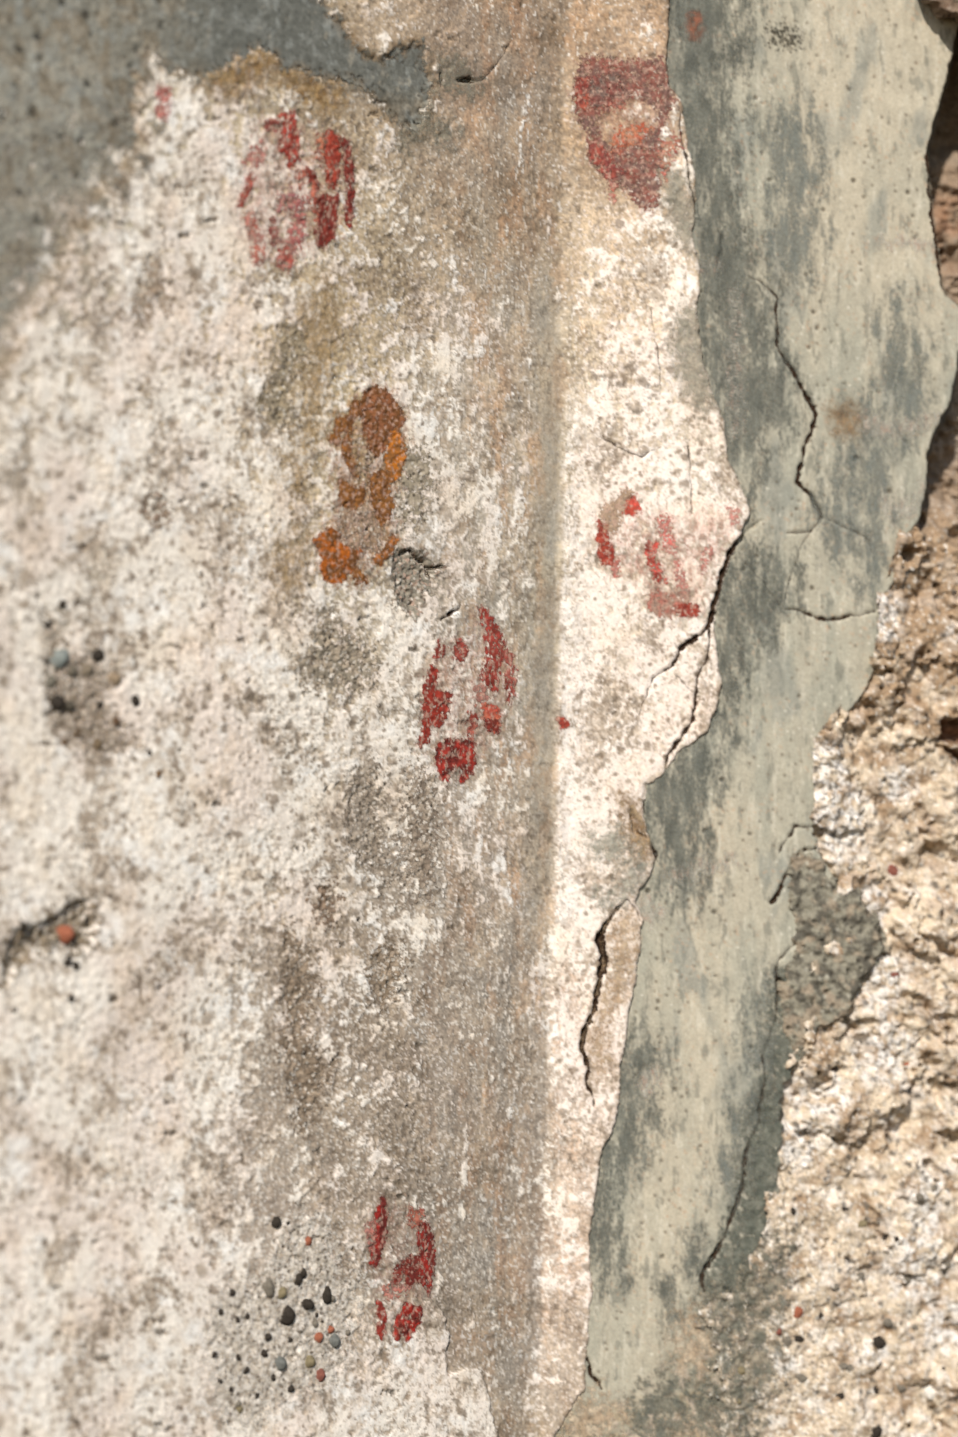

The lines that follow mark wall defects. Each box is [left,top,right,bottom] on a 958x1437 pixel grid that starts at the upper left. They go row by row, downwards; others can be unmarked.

peeling [0,0,436,322]
crack [759,281,875,621]
crack [646,537,740,767]
crack [579,899,635,1105]
spalling [776,847,892,1064]